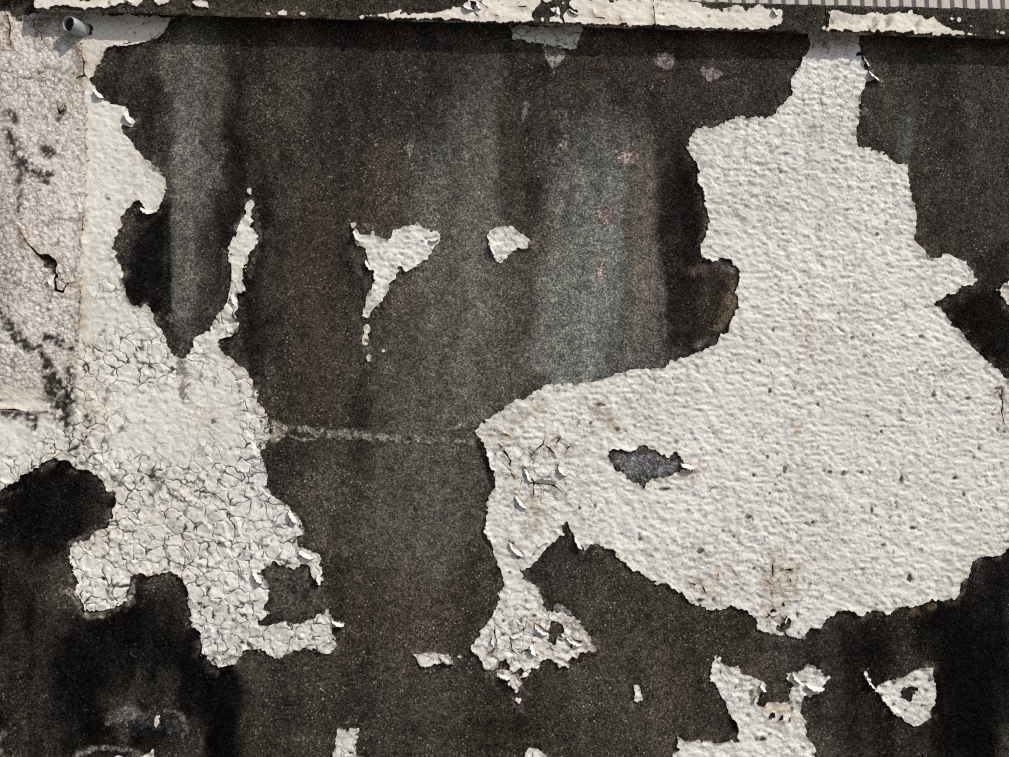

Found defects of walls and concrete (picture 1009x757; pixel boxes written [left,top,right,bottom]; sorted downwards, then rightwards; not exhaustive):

peeling [0,0,345,668]
peeling [349,222,441,374]
damp [524,133,700,386]
peeling [413,10,1009,714]
crack [275,417,570,496]
damp [0,571,50,757]
spalling [73,745,163,757]
damp [109,671,179,743]
spalling [105,705,189,739]
peeling [332,727,364,757]
peeling [525,747,547,757]